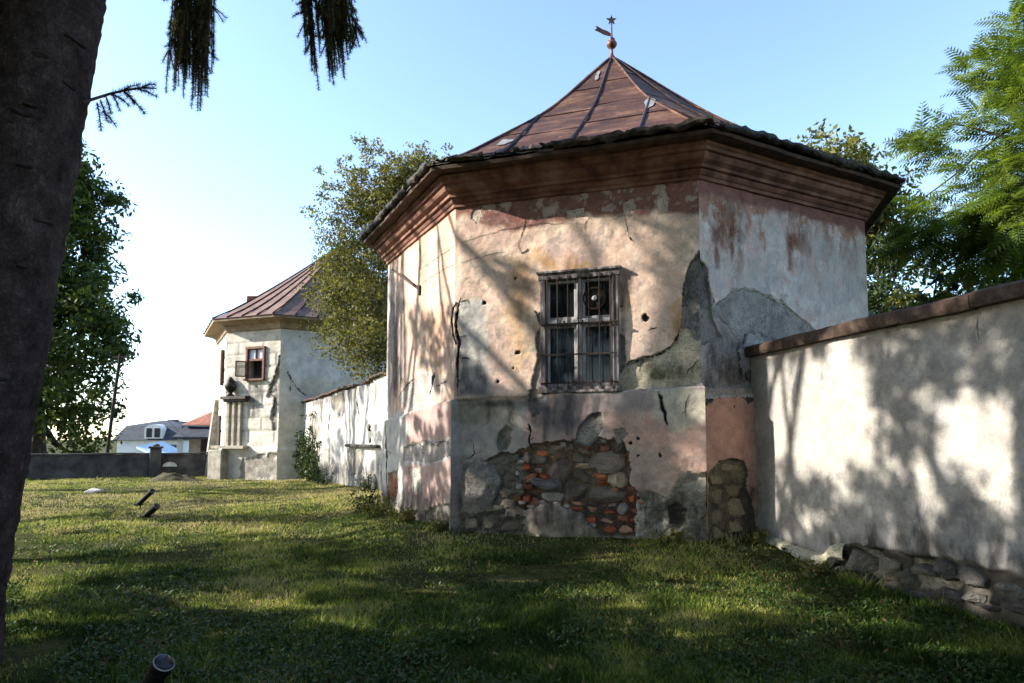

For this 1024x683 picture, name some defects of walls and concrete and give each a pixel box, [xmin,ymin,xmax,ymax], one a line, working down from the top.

peeling [472,208,483,224]
peeling [566,208,585,219]
peeling [657,184,670,215]
crack [415,218,589,284]
spalling [681,251,722,346]
crack [402,298,470,396]
crack [659,359,700,425]
flaking render [510,437,646,538]
flaking render [707,458,757,542]